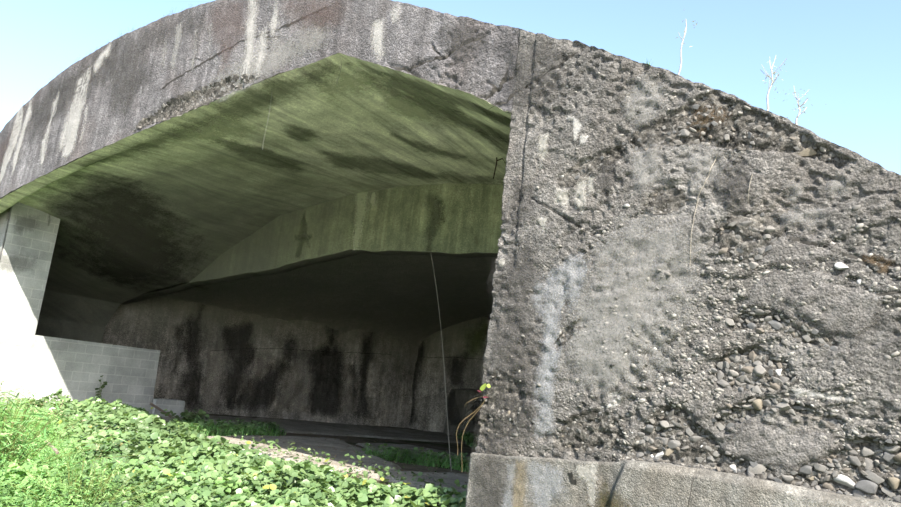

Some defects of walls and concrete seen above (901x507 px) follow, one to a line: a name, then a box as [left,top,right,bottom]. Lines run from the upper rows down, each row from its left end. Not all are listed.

leakage [0,18,197,181]
spalling [133,74,259,132]
leakage [87,0,333,170]
crack [159,6,330,91]
leakage [372,9,398,54]
leakage [323,153,493,182]
leakage [339,64,511,152]
crack [390,34,489,77]
spalling [555,90,849,214]
leakage [448,221,699,444]
spalling [725,308,838,351]
spalling [552,347,901,504]